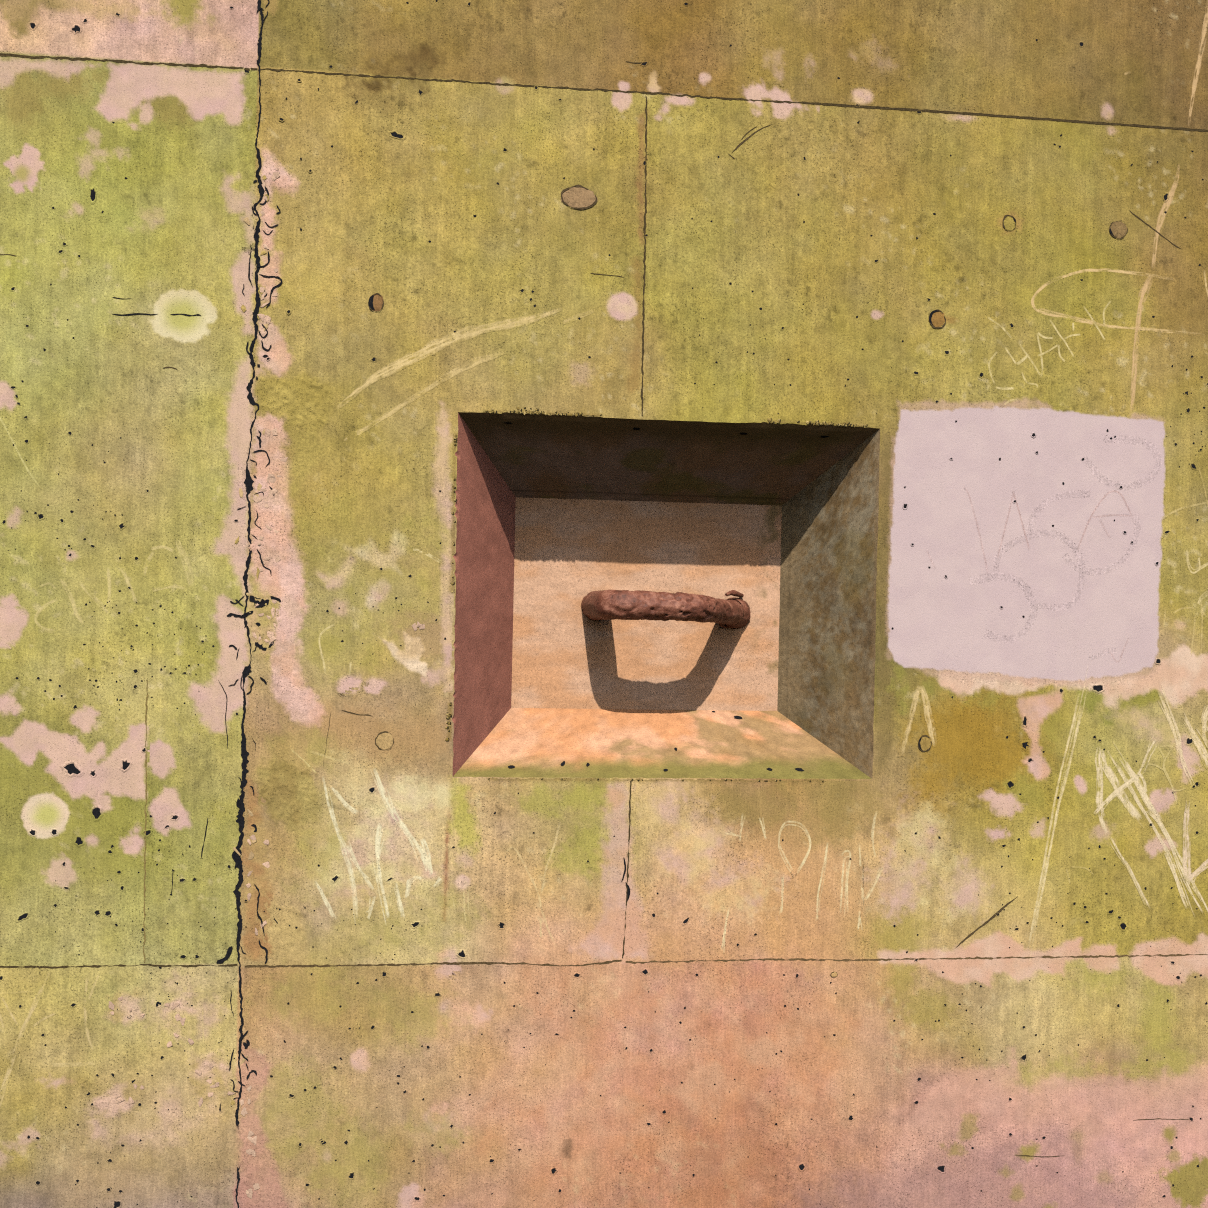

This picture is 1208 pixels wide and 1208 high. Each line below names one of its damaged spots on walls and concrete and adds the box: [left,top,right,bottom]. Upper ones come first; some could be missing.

peeling [0,52,251,223]
spalling [112,141,387,739]
crack [201,0,283,1129]
peeling [0,687,194,895]
spalling [0,775,293,1208]
peeling [853,787,1208,992]
peeling [935,615,1208,862]
crack [233,1167,241,1208]